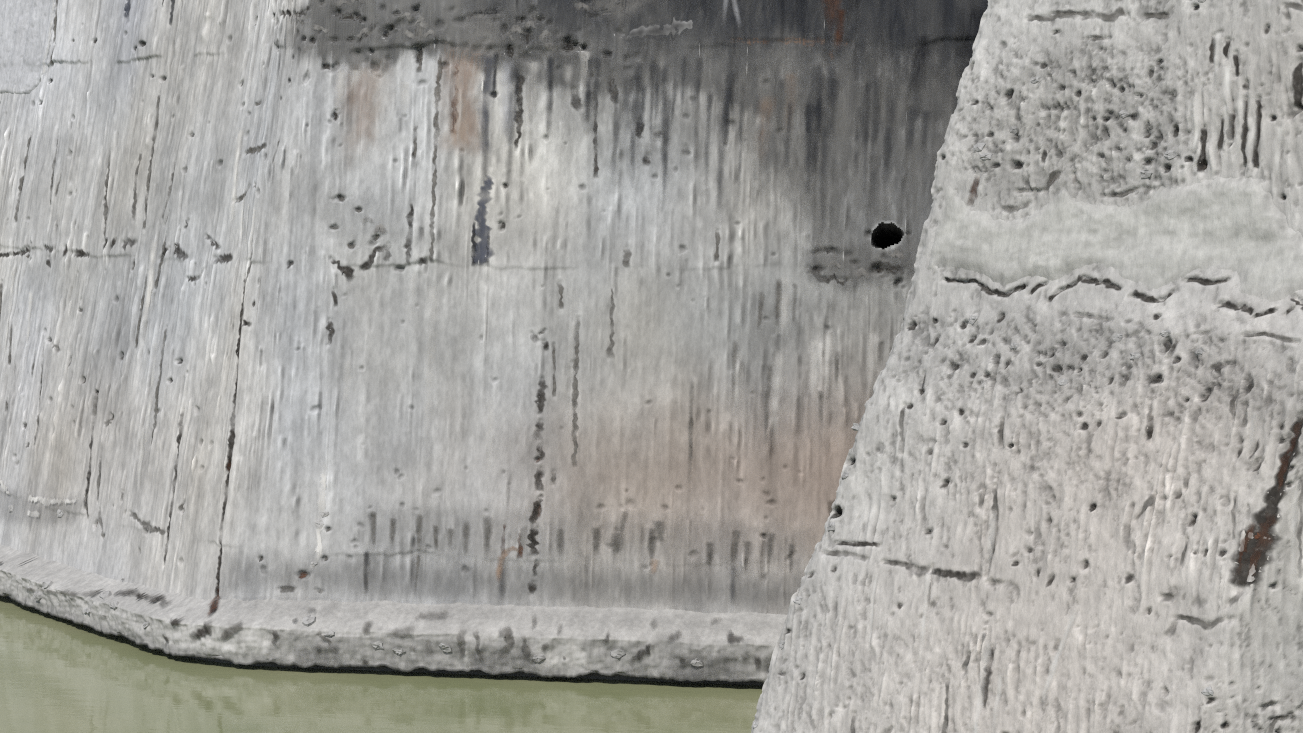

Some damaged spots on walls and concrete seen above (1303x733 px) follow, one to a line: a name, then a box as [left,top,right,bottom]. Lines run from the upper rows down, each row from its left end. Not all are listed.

damp [310,0,988,269]
crack [945,275,1303,342]
crack [1166,418,1303,632]